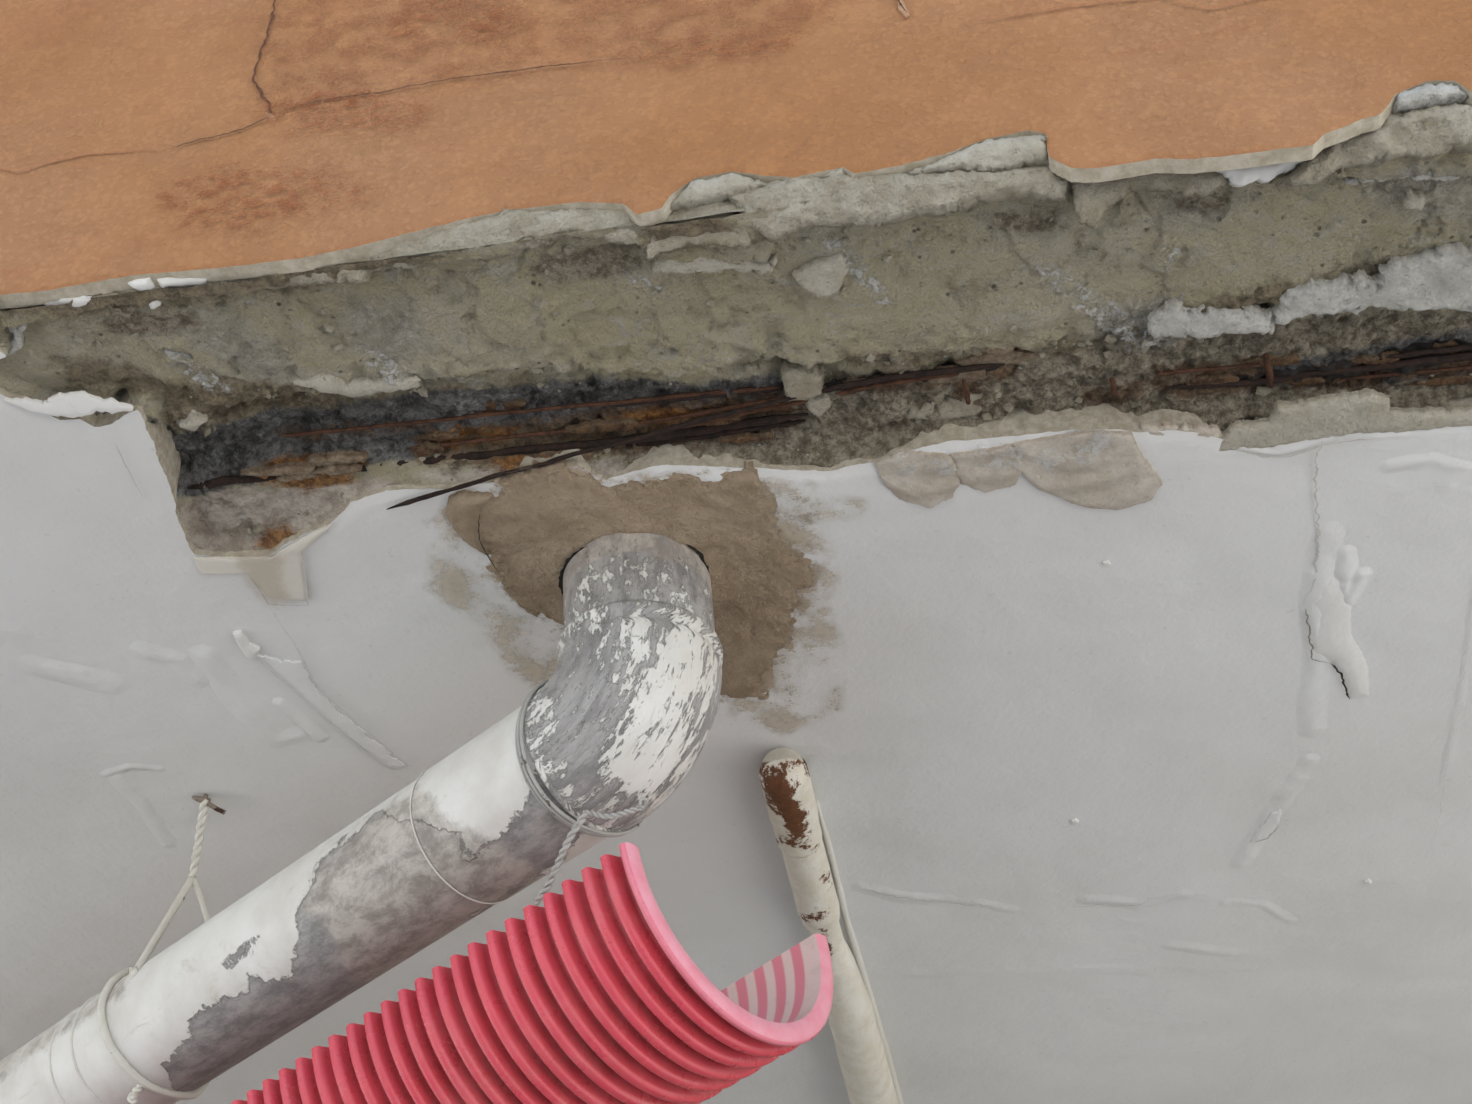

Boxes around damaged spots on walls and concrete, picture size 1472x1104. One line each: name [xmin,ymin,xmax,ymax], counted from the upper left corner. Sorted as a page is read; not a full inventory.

crack [0,0,629,173]
crack [897,0,910,20]
spalling [0,83,1472,606]
crack [1296,446,1374,739]